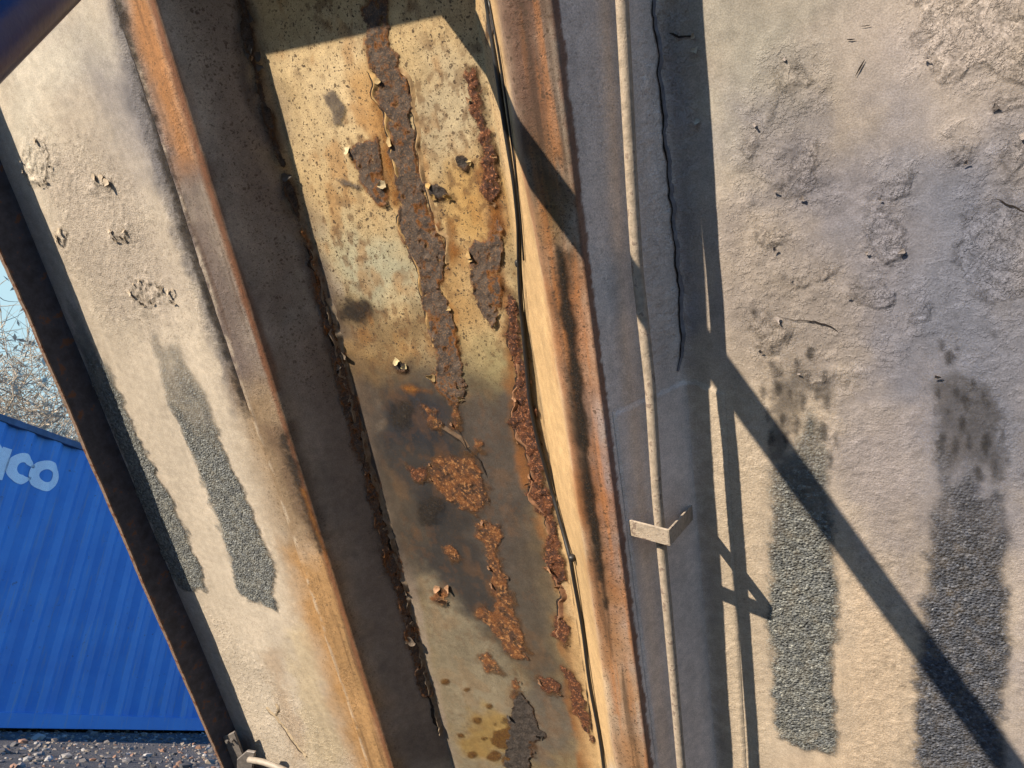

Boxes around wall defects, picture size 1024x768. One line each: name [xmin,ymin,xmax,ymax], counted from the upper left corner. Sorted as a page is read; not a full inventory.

corrosion [463,66,500,221]
crack [652,0,698,371]
corrosion [504,289,570,648]
corrosion [407,439,533,661]
corrosion [467,727,511,762]
corrosion [478,652,521,699]
peeling [503,692,546,768]
corrosion [538,665,595,743]